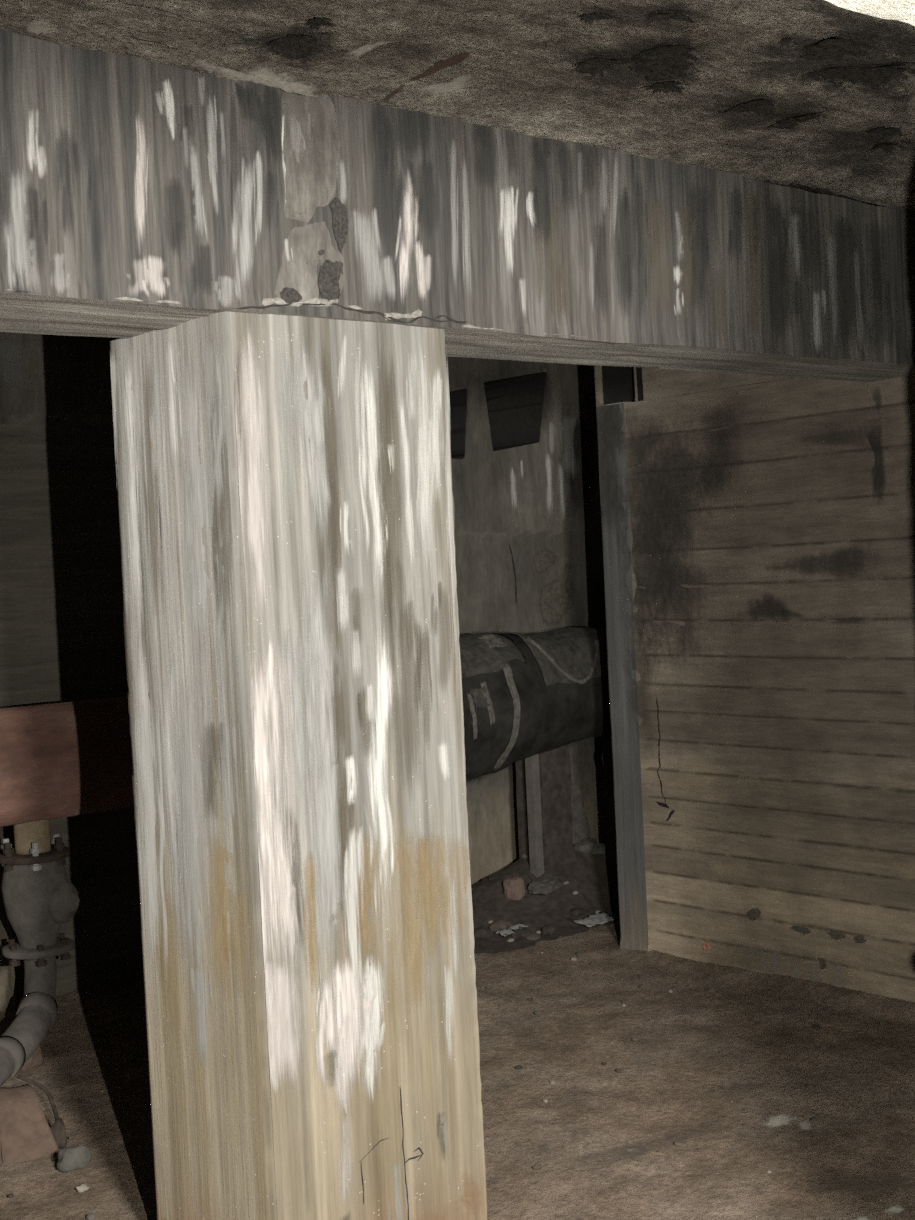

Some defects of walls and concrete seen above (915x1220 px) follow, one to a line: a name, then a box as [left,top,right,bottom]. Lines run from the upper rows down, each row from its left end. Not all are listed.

water stain [5,176,47,294]
water stain [136,123,148,233]
water stain [113,257,180,304]
water stain [164,80,174,136]
water stain [169,97,217,243]
water stain [200,59,315,304]
peeling [275,91,349,304]
corrosion [384,53,469,101]
water stain [293,340,441,622]
water stain [440,744,449,779]
crack [656,697,675,821]
water stain [252,583,394,1111]